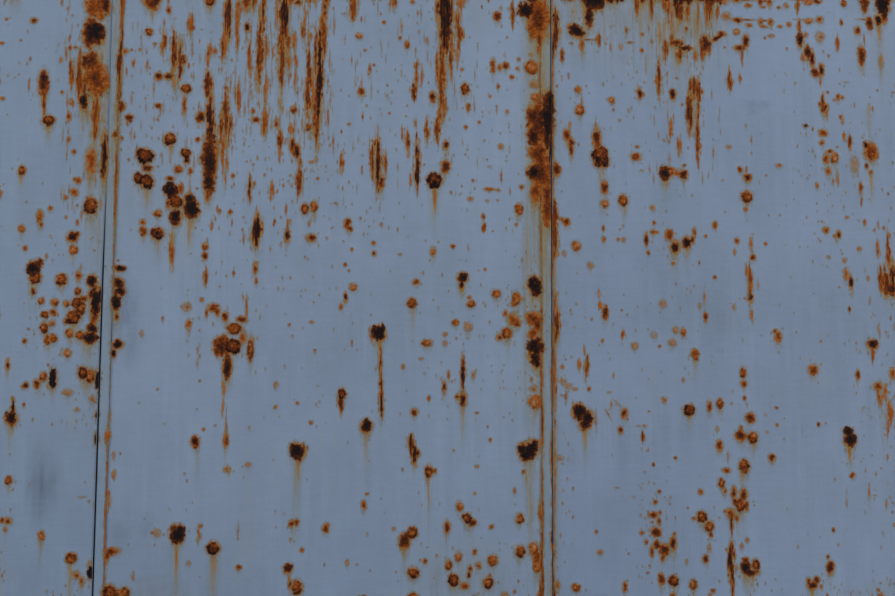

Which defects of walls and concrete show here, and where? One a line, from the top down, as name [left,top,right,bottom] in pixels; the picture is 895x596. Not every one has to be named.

rust [357,64,398,199]
rust [398,0,483,212]
rust [21,0,351,449]
rust [339,283,357,310]
rust [863,219,895,300]
rust [369,323,387,420]
rust [392,526,418,554]
rust [396,549,498,596]
rust [456,501,477,527]